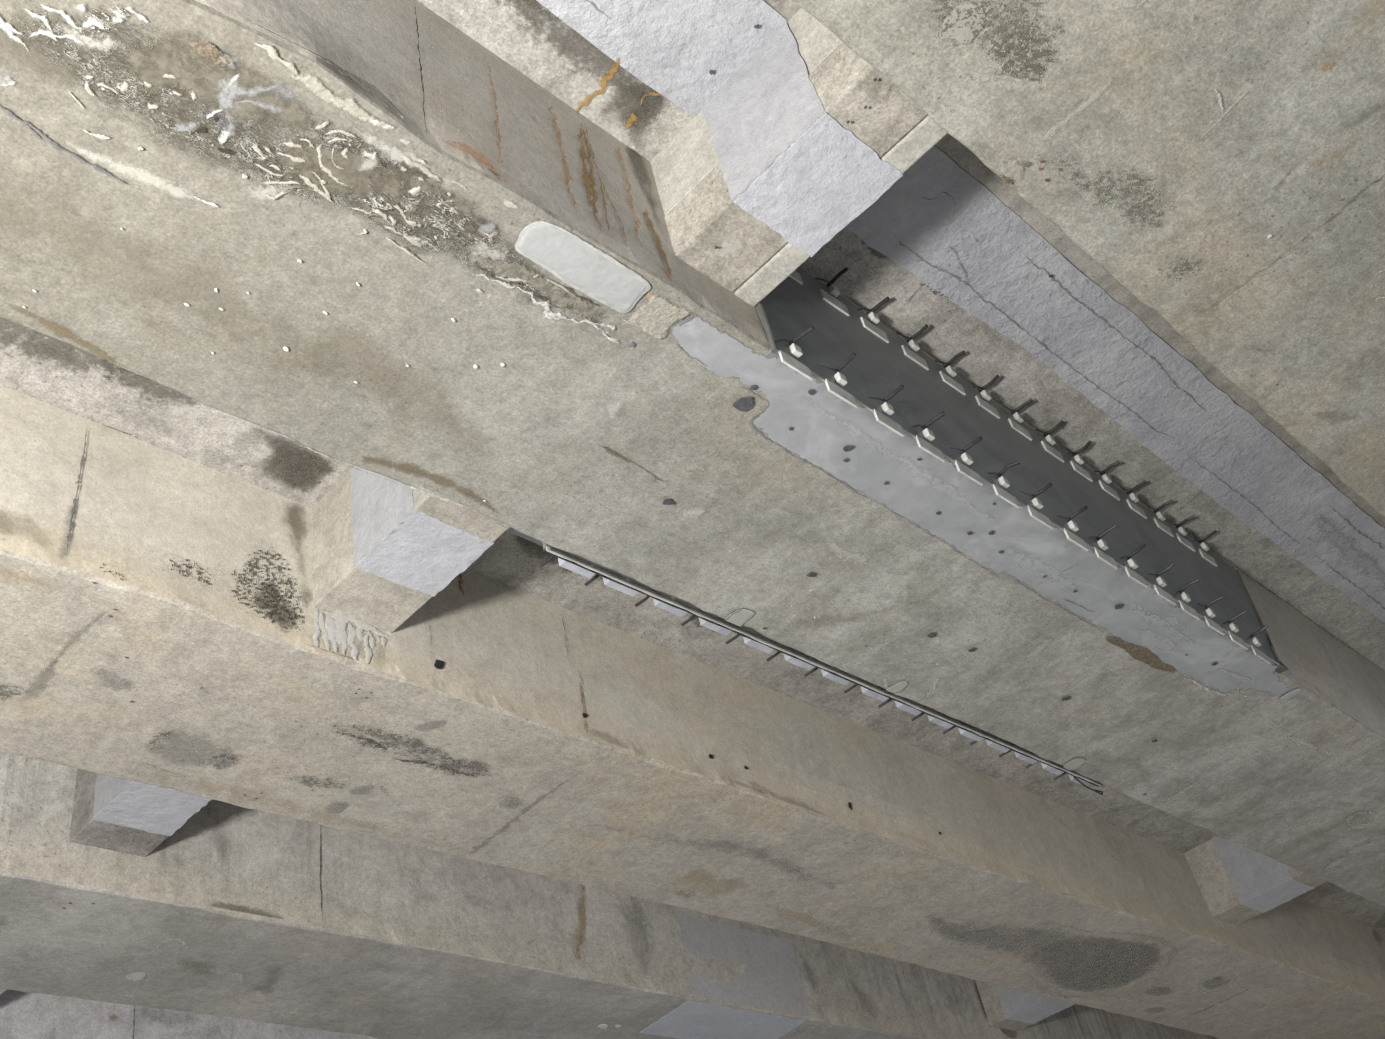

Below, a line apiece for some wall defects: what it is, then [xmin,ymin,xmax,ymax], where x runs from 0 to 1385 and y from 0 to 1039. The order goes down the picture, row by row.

efflorescence [0,4,147,49]
damp [128,33,306,144]
damp [285,147,491,247]
rust [445,67,506,181]
damp [497,0,662,135]
rust [549,59,674,281]
damp [476,274,619,343]
crack [894,235,1385,610]
damp [167,558,210,588]
damp [231,546,388,664]
spalling [1106,636,1175,673]